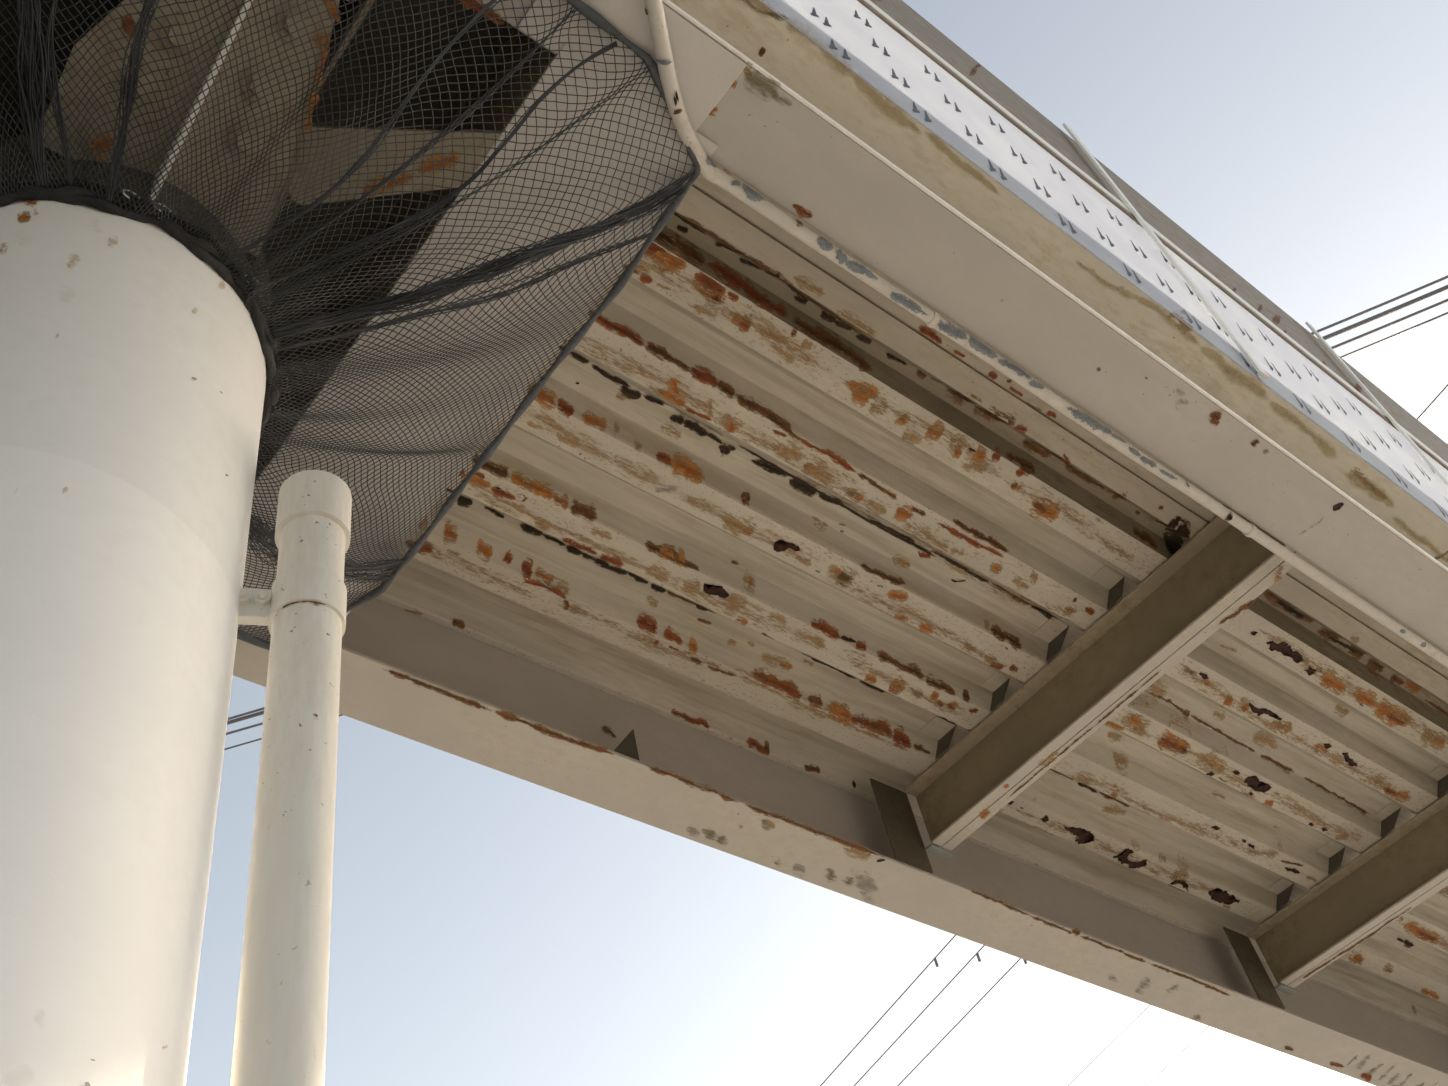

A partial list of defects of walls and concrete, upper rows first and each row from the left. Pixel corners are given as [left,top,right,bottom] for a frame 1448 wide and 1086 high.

damp [747,71,789,104]
rust [624,212,1177,560]
rust [527,311,1094,672]
damp [1351,467,1386,498]
peeling [773,540,820,573]
rust [388,454,978,755]
peeling [684,581,730,598]
peeling [1251,631,1317,676]
rust [1261,600,1448,751]
rust [980,665,1411,854]
peeling [1206,770,1280,808]
peeling [1208,888,1240,905]